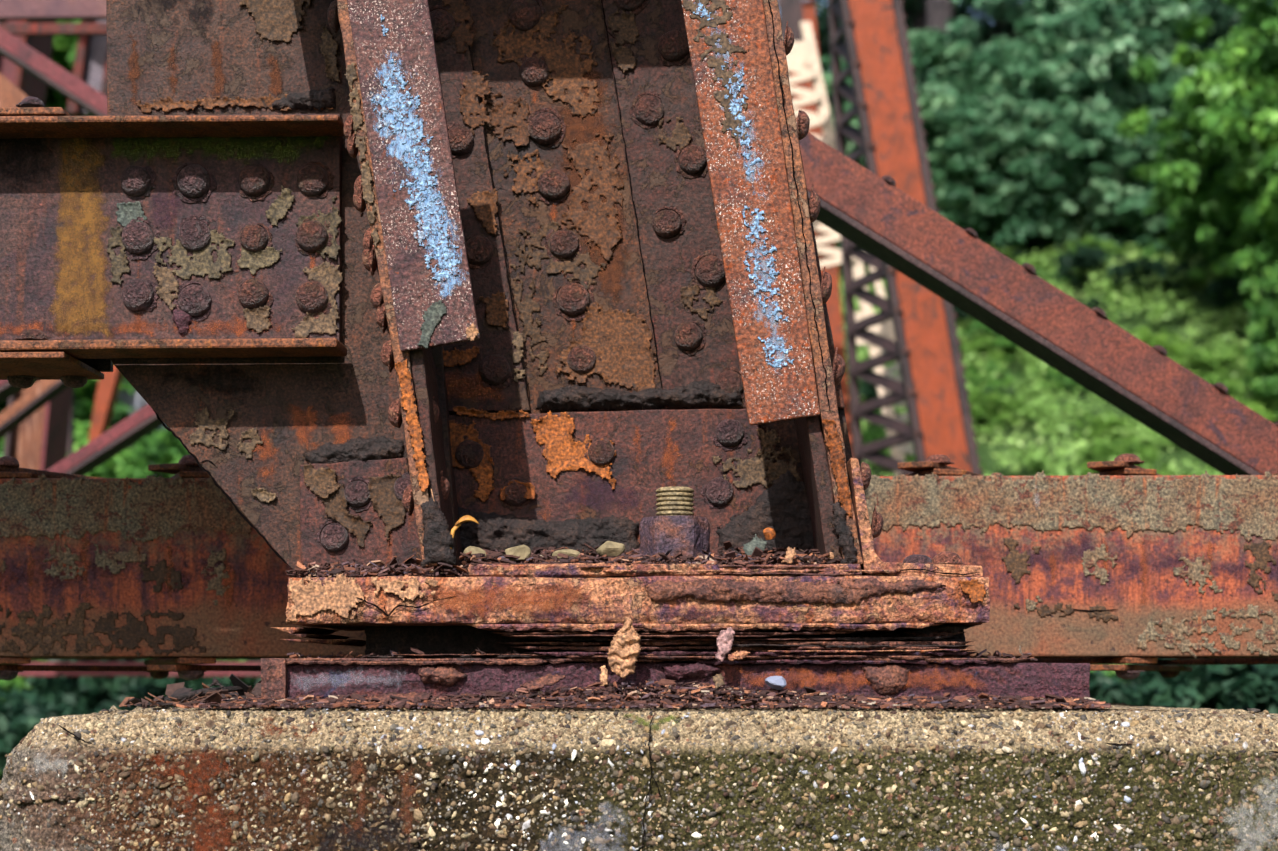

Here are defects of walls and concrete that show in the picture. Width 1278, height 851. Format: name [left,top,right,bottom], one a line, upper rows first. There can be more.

peeling [239,0,311,43]
peeling [493,4,600,118]
corrosion [0,138,159,337]
peeling [152,227,282,310]
peeling [265,186,343,338]
peeling [443,71,657,392]
corrosion [550,58,630,300]
peeling [395,359,429,492]
peeling [449,406,616,502]
peeling [286,463,842,622]
peeling [822,419,1278,658]
peeling [0,602,206,658]